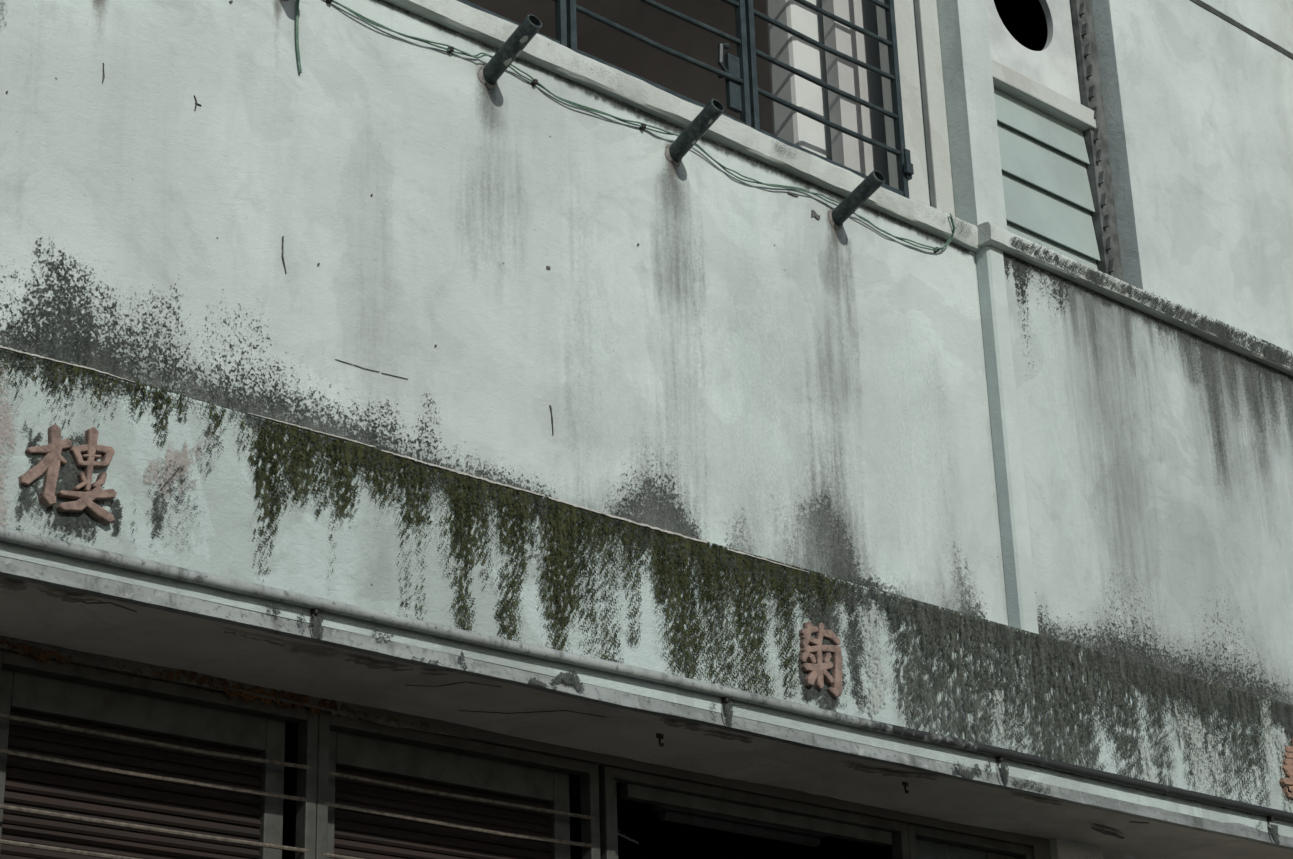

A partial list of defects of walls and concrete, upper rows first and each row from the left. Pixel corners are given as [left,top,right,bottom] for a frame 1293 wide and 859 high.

peeling [0,346,135,384]
damp [0,236,1293,844]